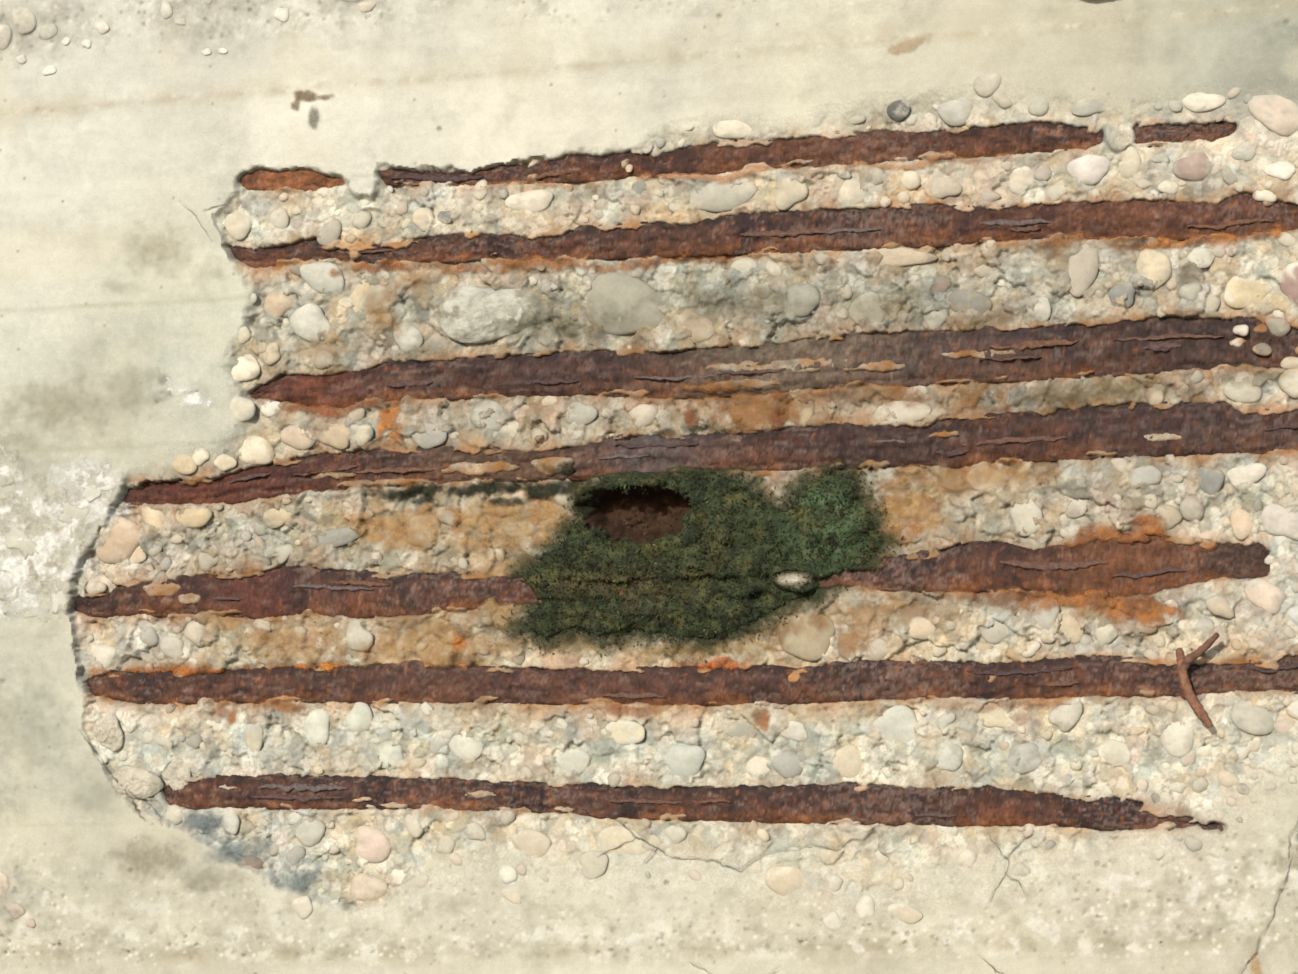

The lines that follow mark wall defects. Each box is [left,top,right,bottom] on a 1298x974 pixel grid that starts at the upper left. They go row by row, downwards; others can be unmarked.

rust [1121,228,1280,249]
rust [330,259,413,275]
spalling [0,73,1298,614]
leakage [45,461,102,520]
leakage [99,488,129,516]
leakage [489,497,522,505]
rust [1067,514,1164,548]
leakage [0,561,39,617]
rust [956,589,1181,623]
rust [121,665,248,676]
spalling [65,402,1298,934]
rust [685,657,738,671]